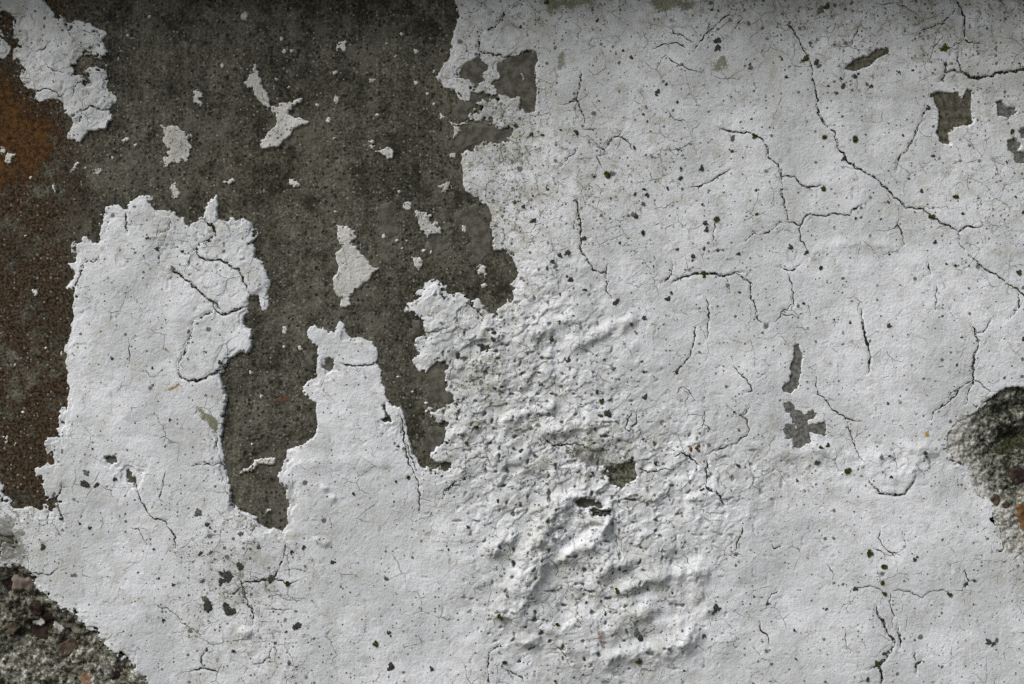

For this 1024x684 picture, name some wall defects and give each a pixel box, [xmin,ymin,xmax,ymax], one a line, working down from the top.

corrosion [0,69,61,190]
peeling [845,48,889,71]
peeling [932,89,973,144]
crack [128,219,252,383]
peeling [0,0,538,532]
crack [576,199,612,298]
crack [639,111,861,506]
crack [777,0,1024,420]
peeling [782,344,826,448]
crack [815,376,914,496]
spalling [0,563,148,684]
crack [845,572,969,684]